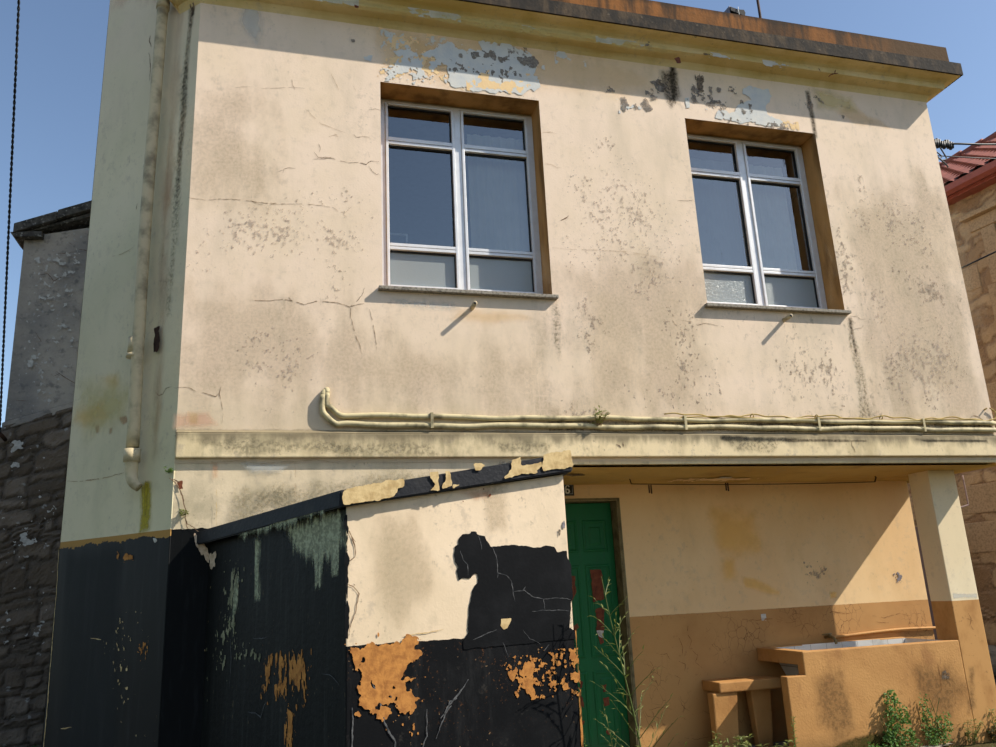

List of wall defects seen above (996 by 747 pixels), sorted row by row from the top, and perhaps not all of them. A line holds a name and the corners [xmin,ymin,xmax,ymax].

peeling [364,27,571,97]
spalling [606,79,670,113]
peeling [685,74,799,131]
crack [255,290,377,349]
peeling [430,471,458,491]
peeling [504,450,584,479]
damp [289,510,342,587]
peeling [194,533,306,701]
peeling [342,479,423,736]
peeling [590,569,605,644]
peeling [504,623,585,747]
peeling [284,709,293,747]